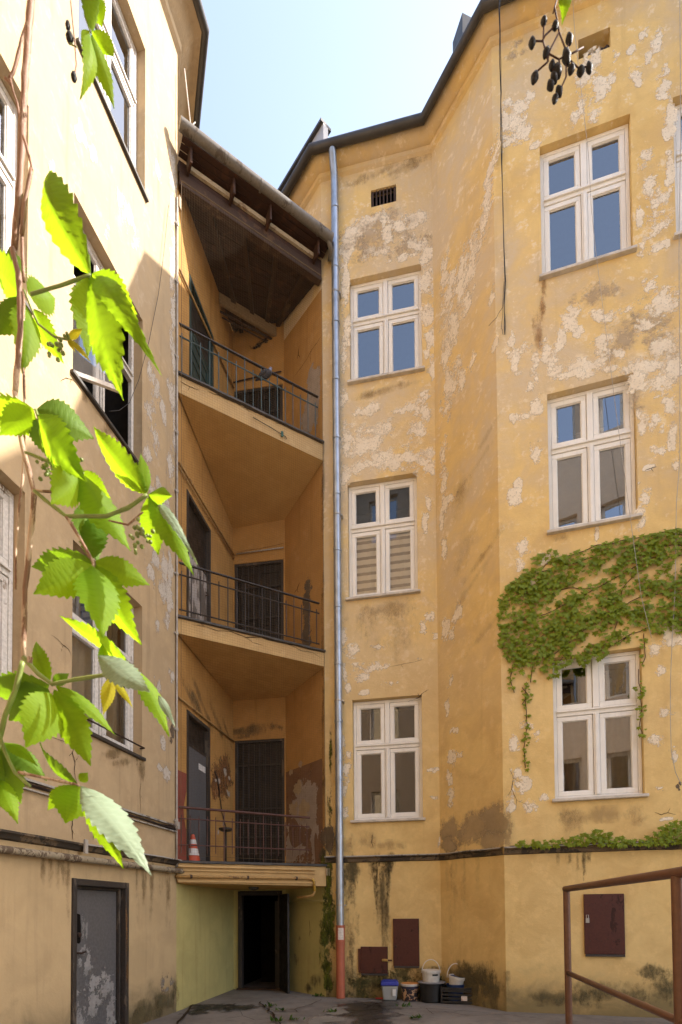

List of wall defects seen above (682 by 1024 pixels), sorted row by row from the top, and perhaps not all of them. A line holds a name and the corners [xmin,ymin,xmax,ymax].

peeling [636,63,678,257]
peeling [339,90,542,560]
peeling [491,275,682,528]
peeling [516,539,528,572]
peeling [419,602,462,641]
peeling [509,722,540,752]
peeling [286,759,335,864]
peeling [481,768,549,849]
leakage [372,862,393,930]
peeling [76,916,116,1024]
leakage [439,964,500,1005]